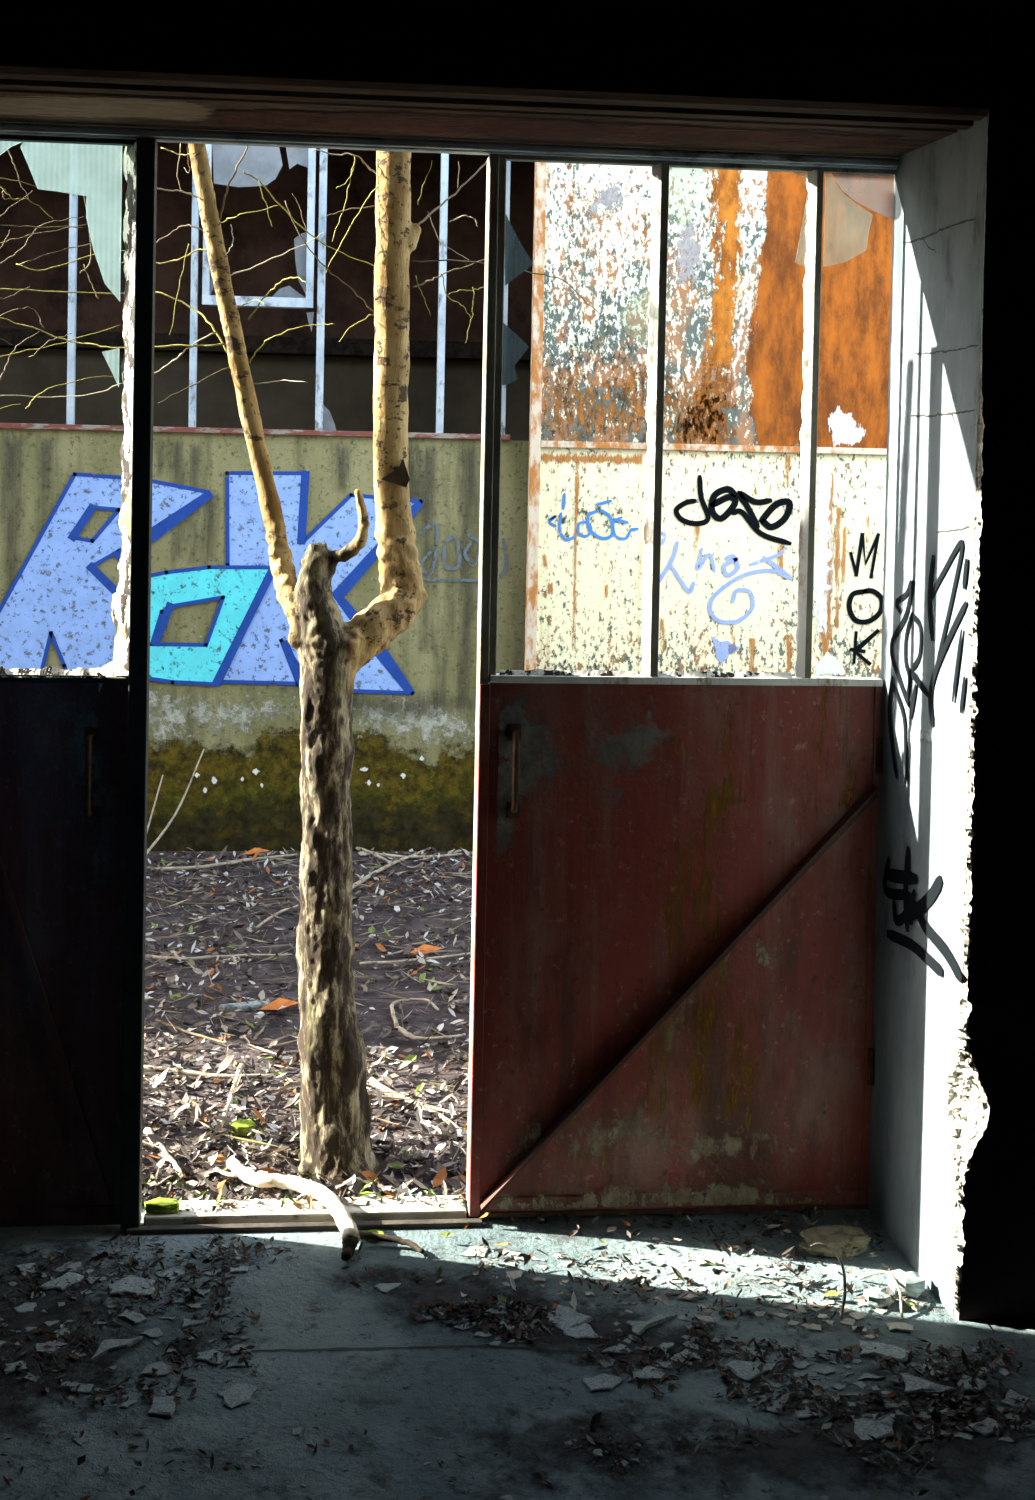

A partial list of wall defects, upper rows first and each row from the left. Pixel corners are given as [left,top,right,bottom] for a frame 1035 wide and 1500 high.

peeling [587,180,624,236]
peeling [671,219,706,299]
corrosion [541,169,894,655]
corrosion [732,628,755,672]
peeling [505,1109,794,1167]
spalling [943,1008,990,1204]
corrosion [494,1182,861,1210]
spalling [950,1243,962,1311]